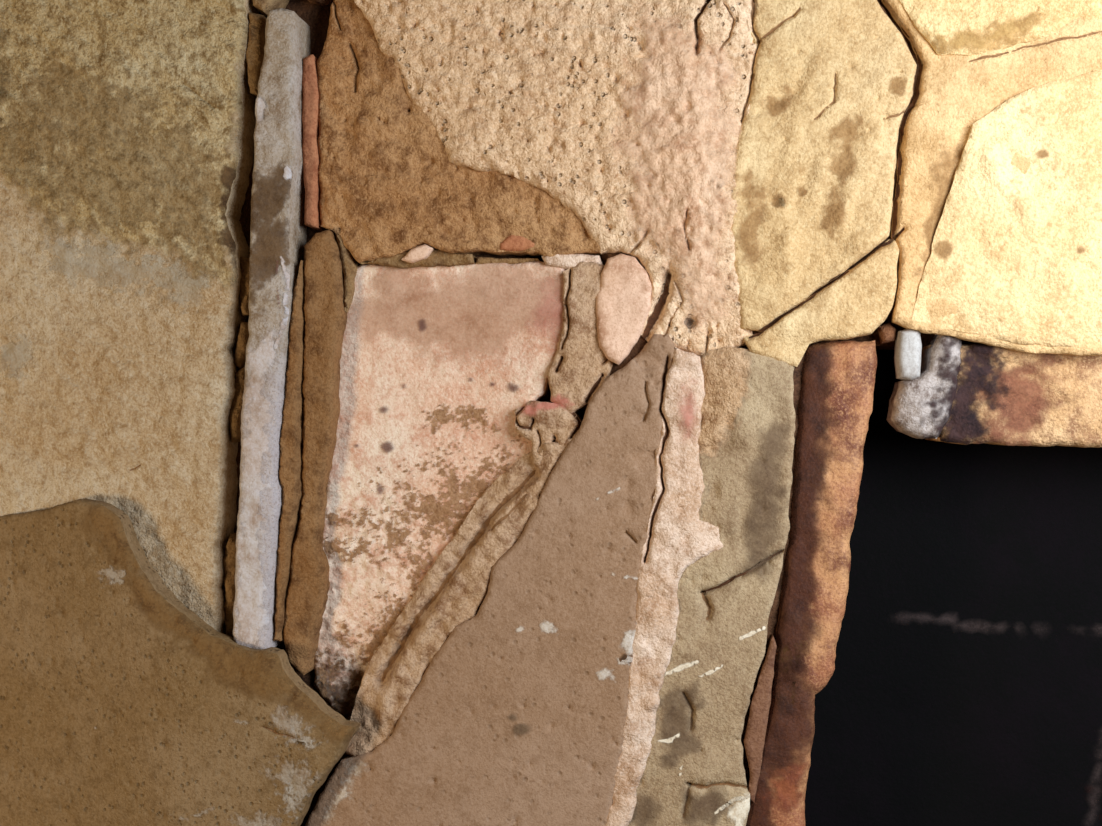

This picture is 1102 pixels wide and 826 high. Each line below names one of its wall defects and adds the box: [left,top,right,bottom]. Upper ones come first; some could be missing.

damp [0,0,291,314]
spalling [317,0,652,365]
crack [694,0,801,122]
crack [749,0,923,339]
damp [85,505,352,826]
damp [324,762,364,819]